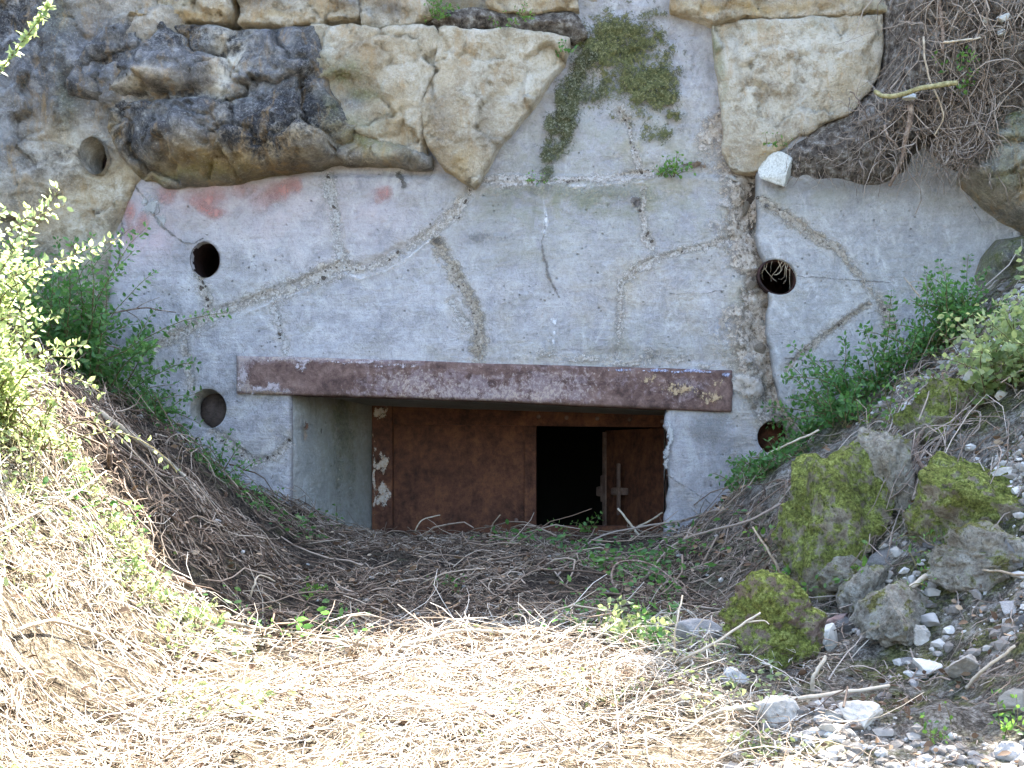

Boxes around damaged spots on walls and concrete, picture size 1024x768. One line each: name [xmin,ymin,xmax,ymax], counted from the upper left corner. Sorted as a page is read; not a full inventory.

crack [135,102,898,440]
corrosion [641,375,724,405]
peeling [372,434,391,507]